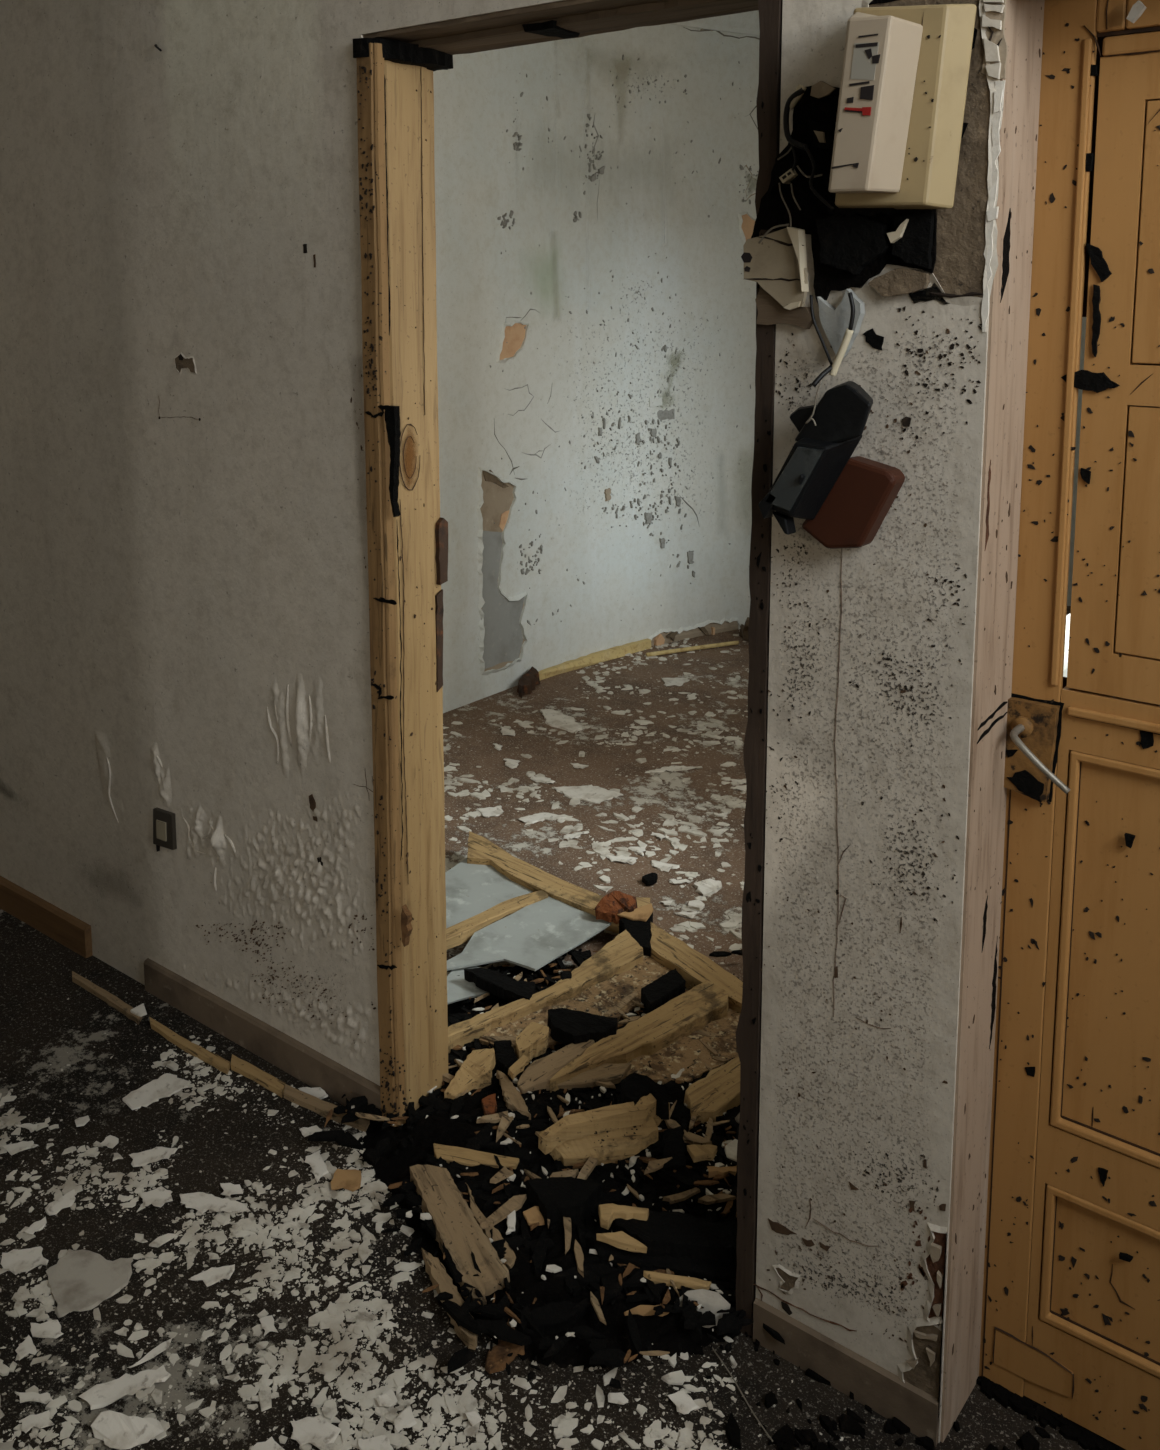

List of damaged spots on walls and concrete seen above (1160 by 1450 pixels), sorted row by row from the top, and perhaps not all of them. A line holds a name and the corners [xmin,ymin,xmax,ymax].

spalling [1126,0,1147,23]
spalling [738,0,1017,332]
spalling [490,292,547,372]
spalling [476,458,572,675]
peeling [522,253,697,584]
peeling [996,445,1069,557]